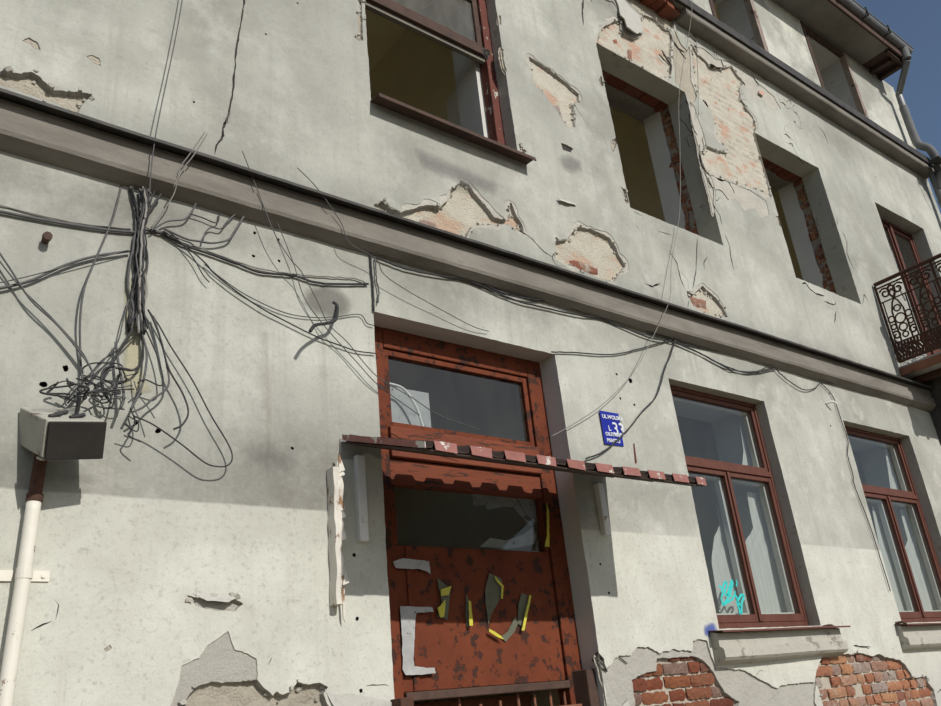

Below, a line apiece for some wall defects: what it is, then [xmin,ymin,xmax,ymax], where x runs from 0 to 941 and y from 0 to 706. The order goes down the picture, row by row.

spalling [0,66,95,113]
crack [214,0,245,153]
spalling [525,53,585,128]
spalling [593,0,804,226]
spalling [374,178,526,238]
spalling [552,221,629,282]
spalling [676,271,727,319]
spalling [171,631,392,706]
flaking render [594,639,937,706]